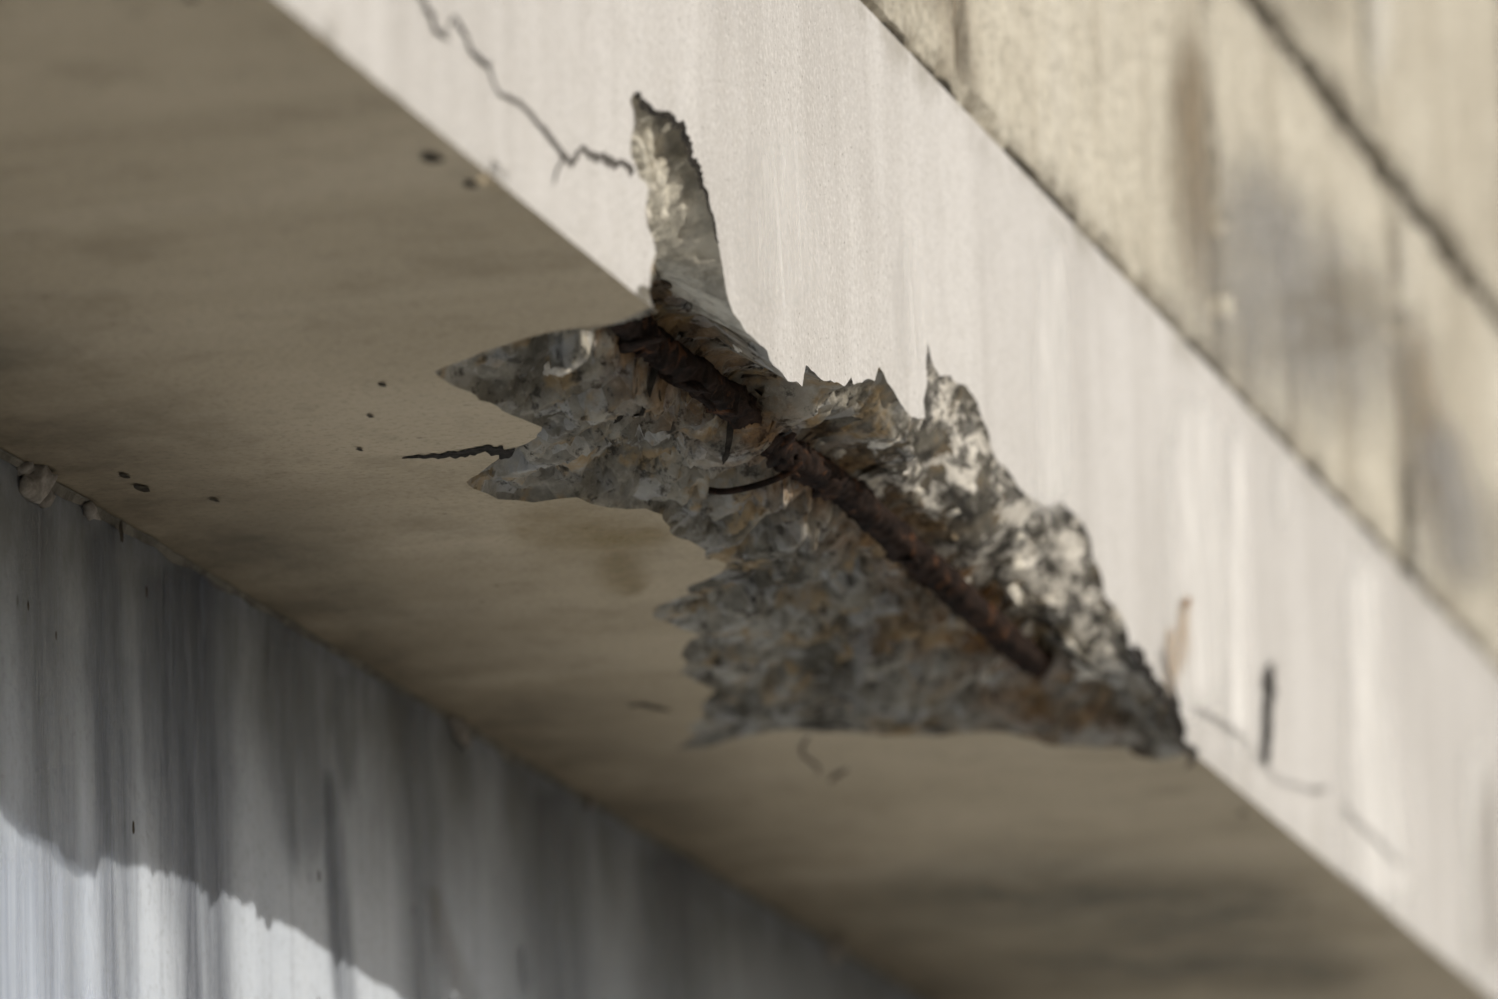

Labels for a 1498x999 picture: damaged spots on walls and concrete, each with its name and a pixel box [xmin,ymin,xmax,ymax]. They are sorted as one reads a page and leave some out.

crack [421,0,634,184]
damp [16,461,58,508]
crack [402,445,516,460]
spalling [434,92,1185,761]
damp [156,574,227,999]